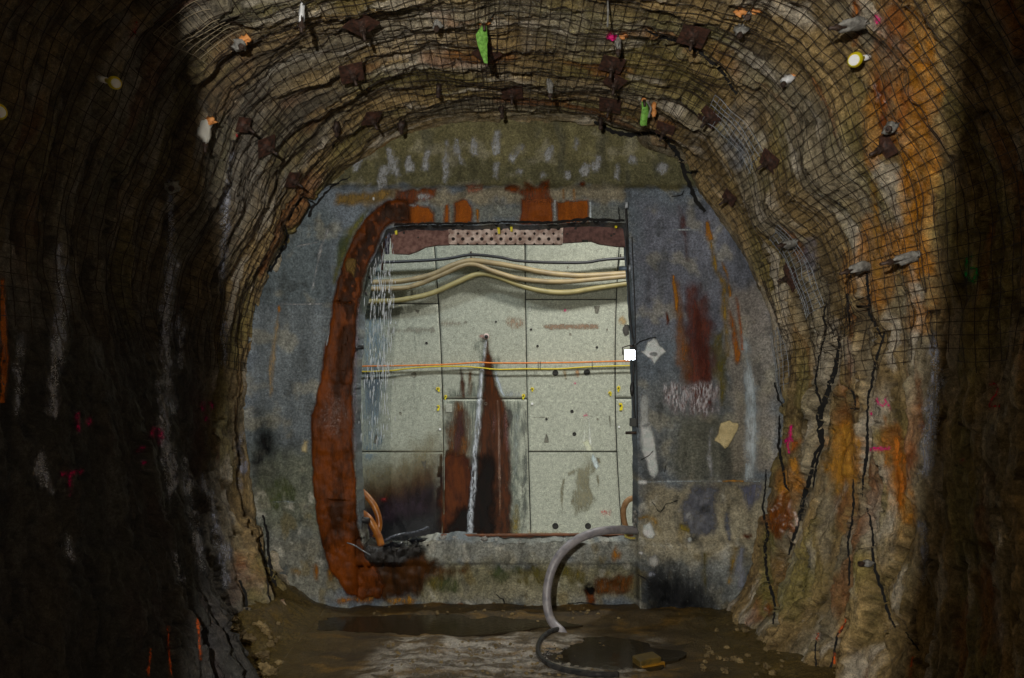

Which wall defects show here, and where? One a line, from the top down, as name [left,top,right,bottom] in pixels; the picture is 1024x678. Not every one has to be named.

efflorescence [367,148,430,190]
efflorescence [442,139,477,182]
efflorescence [492,131,523,174]
rust [505,181,588,224]
efflorescence [565,156,601,179]
crack [593,121,706,212]
rust [664,222,744,414]
rust [311,184,482,604]
leakage [364,268,438,542]
rust [439,335,527,534]
crack [761,273,920,651]
crack [814,621,847,668]